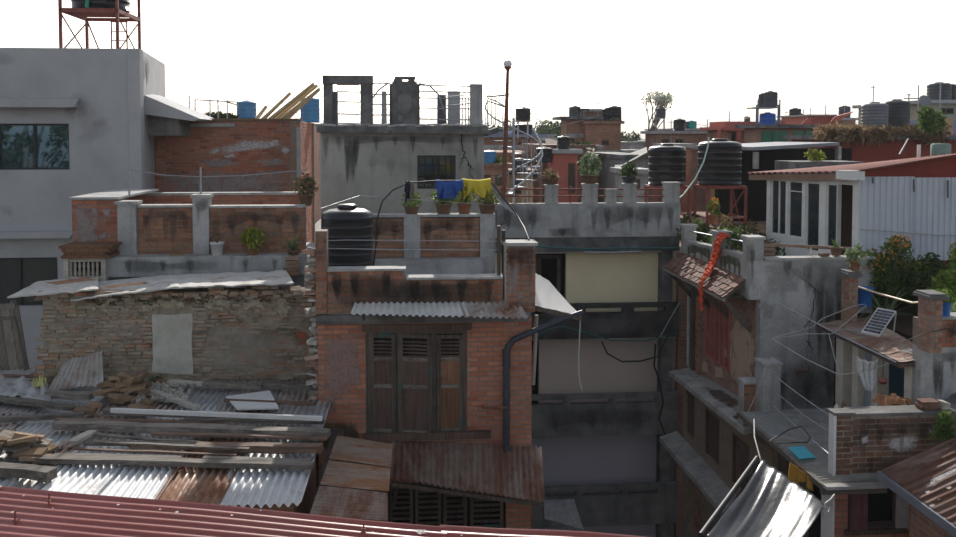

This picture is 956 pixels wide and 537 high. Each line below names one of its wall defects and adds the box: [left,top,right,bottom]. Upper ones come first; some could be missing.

peeling [210,140,289,158]
crack [460,134,474,179]
damp [333,275,475,304]
crack [802,288,816,364]